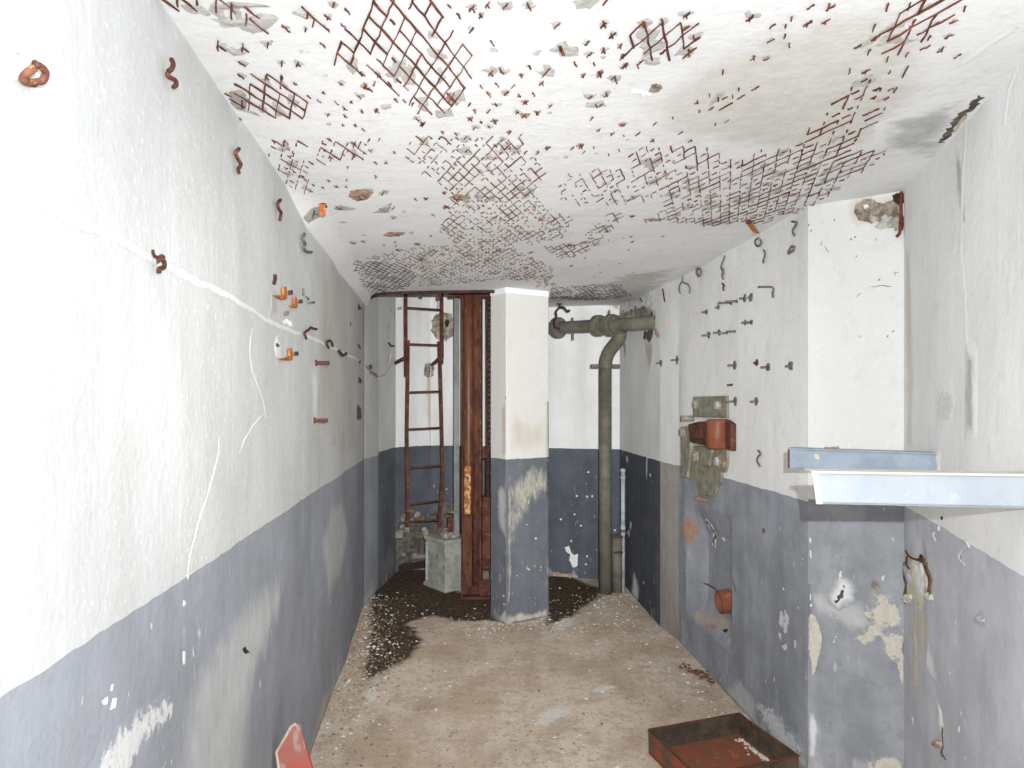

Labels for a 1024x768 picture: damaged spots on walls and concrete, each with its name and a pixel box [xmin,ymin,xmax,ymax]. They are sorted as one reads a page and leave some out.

spalling [180,0,339,117]
peeling [323,58,391,114]
peeling [385,55,416,85]
peeling [412,30,466,145]
peeling [454,66,553,174]
flaking render [512,0,998,267]
spalling [333,185,406,224]
spalling [430,174,511,232]
crack [187,328,267,575]
peeling [540,540,588,578]
peeling [85,542,288,768]
peeling [808,550,934,687]